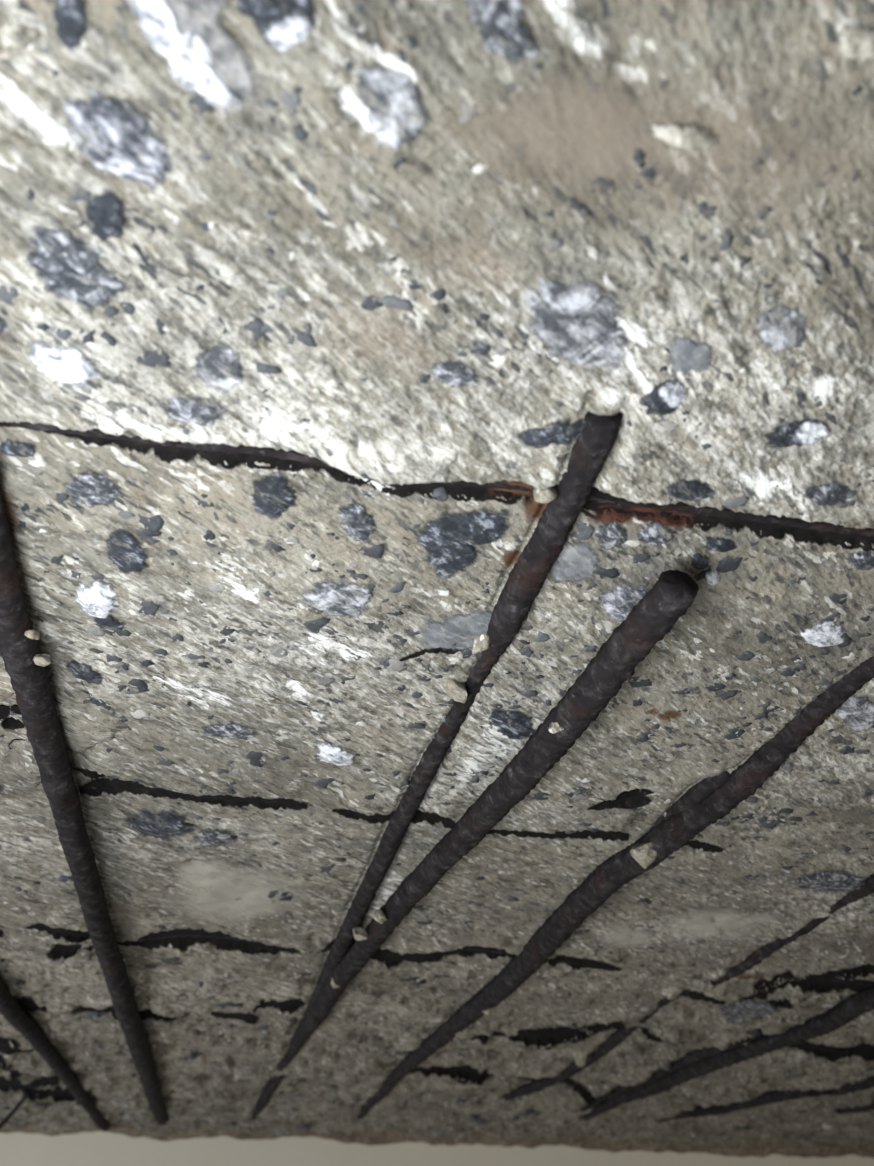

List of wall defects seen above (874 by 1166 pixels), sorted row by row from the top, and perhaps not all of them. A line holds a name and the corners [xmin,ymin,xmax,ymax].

spalling [651,122,718,150]
spalling [0,421,338,469]
crack [0,423,556,505]
corrosion [0,486,15,535]
corrosion [496,481,547,519]
corrosion [593,506,692,528]
crack [582,487,874,551]
corrosion [502,552,519,566]
spalling [251,411,874,1122]
spalling [0,487,262,1132]
crack [72,767,455,829]
crack [0,923,513,970]